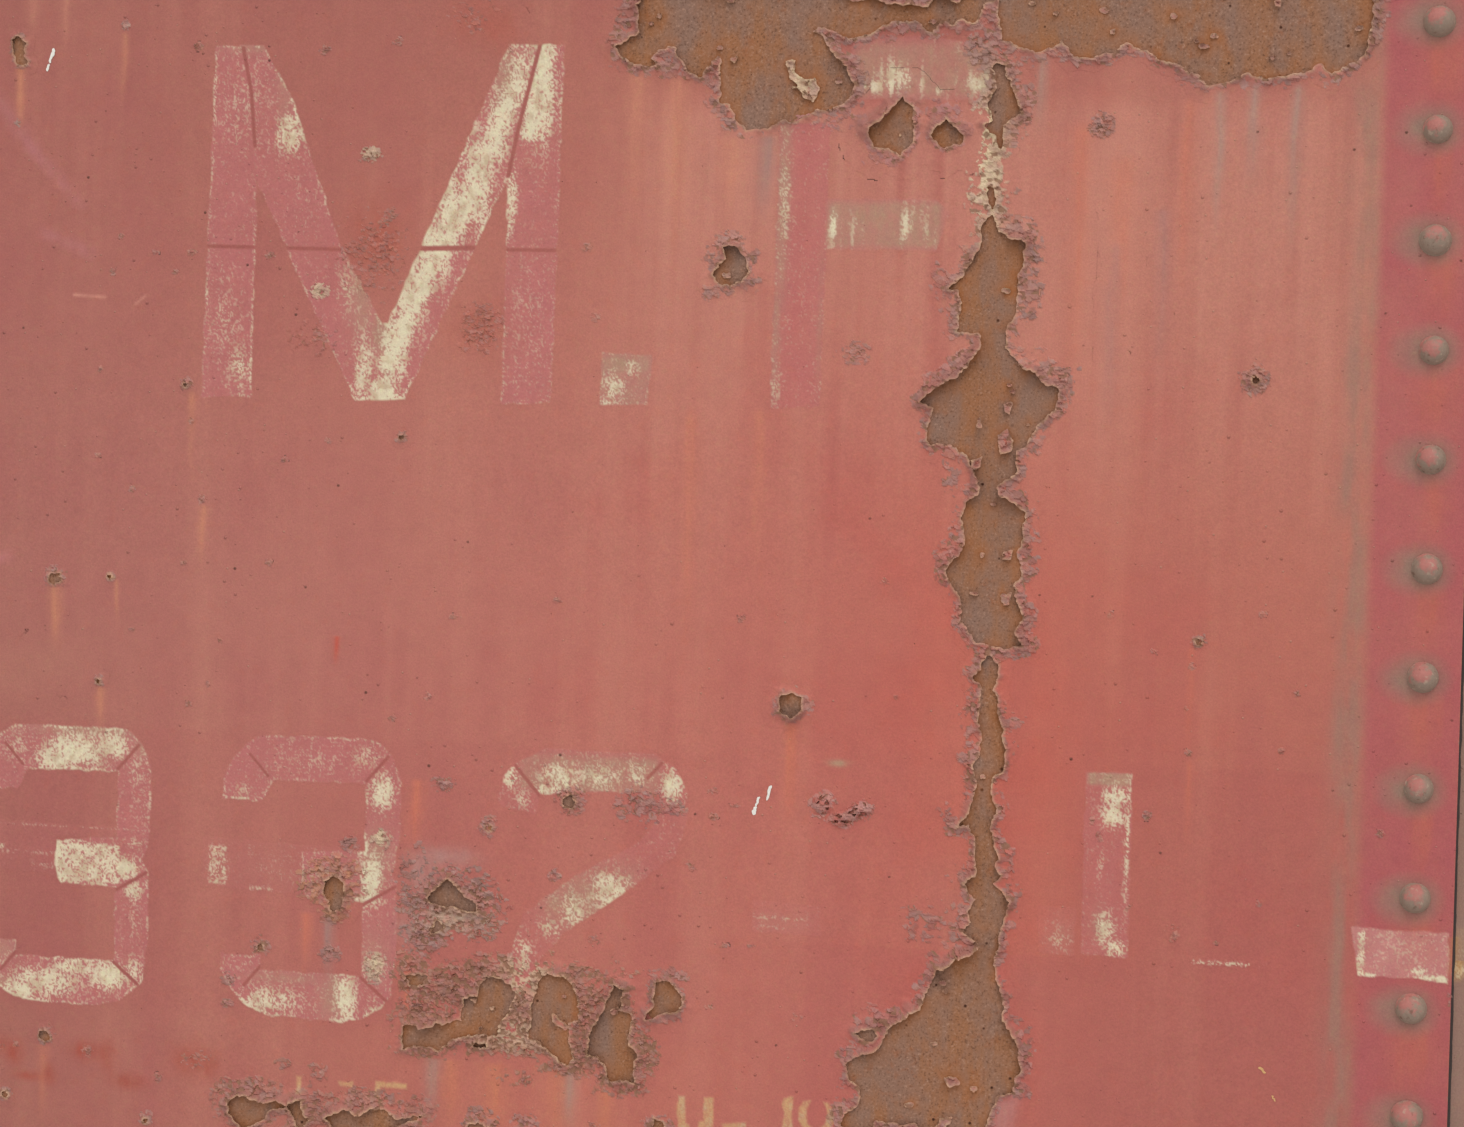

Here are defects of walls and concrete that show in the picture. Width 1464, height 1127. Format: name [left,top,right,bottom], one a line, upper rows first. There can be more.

peeling [598,0,1395,1127]
peeling [208,1056,546,1127]
peeling [294,827,703,1127]